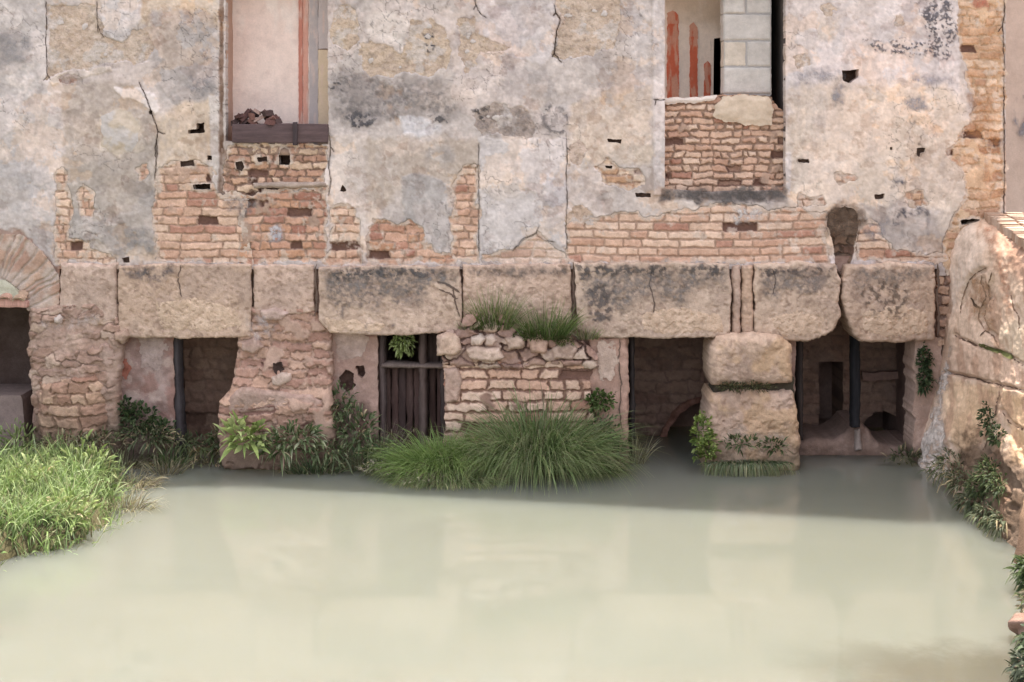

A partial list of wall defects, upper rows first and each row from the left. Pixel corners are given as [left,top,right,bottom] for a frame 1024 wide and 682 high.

crack [552,5,562,62]
crack [139,82,165,173]
mould [351,112,373,128]
flaking render [855,0,1009,276]
flaking render [53,167,130,266]
flaking render [135,139,830,267]
crack [936,263,1020,347]